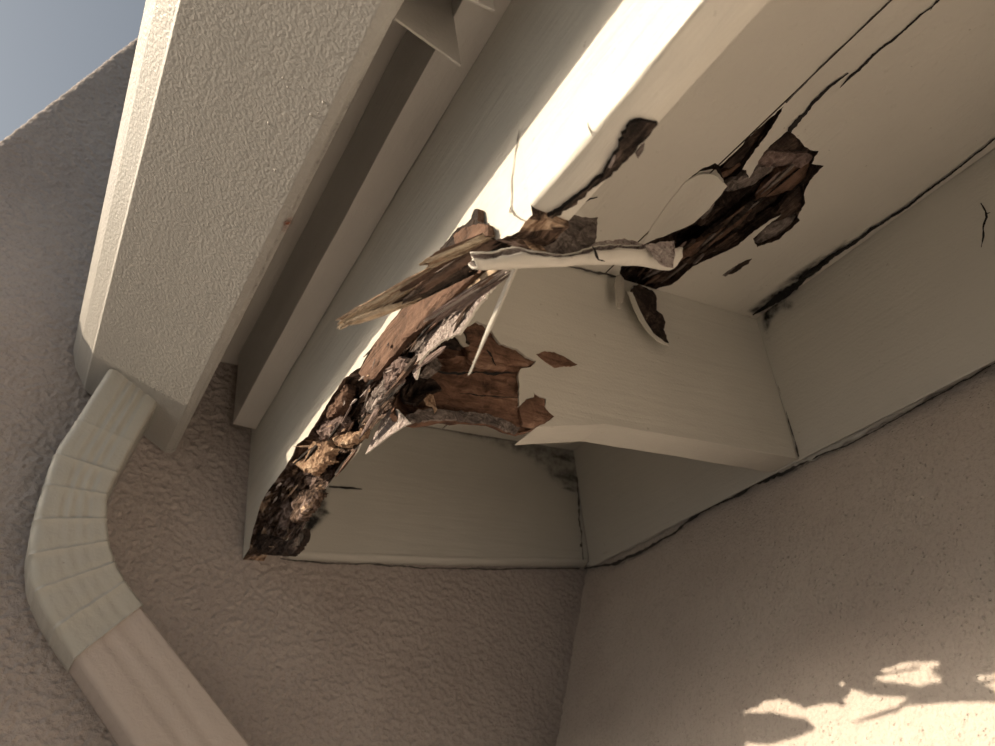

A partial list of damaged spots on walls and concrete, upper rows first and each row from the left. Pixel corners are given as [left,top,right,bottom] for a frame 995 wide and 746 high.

crack [785,0,940,133]
crack [747,138,995,316]
peeling [723,259,751,277]
water stain [752,257,829,328]
peeling [455,333,470,347]
peeling [536,351,577,368]
peeling [423,394,437,414]
peeling [334,409,412,475]
crack [280,363,995,570]